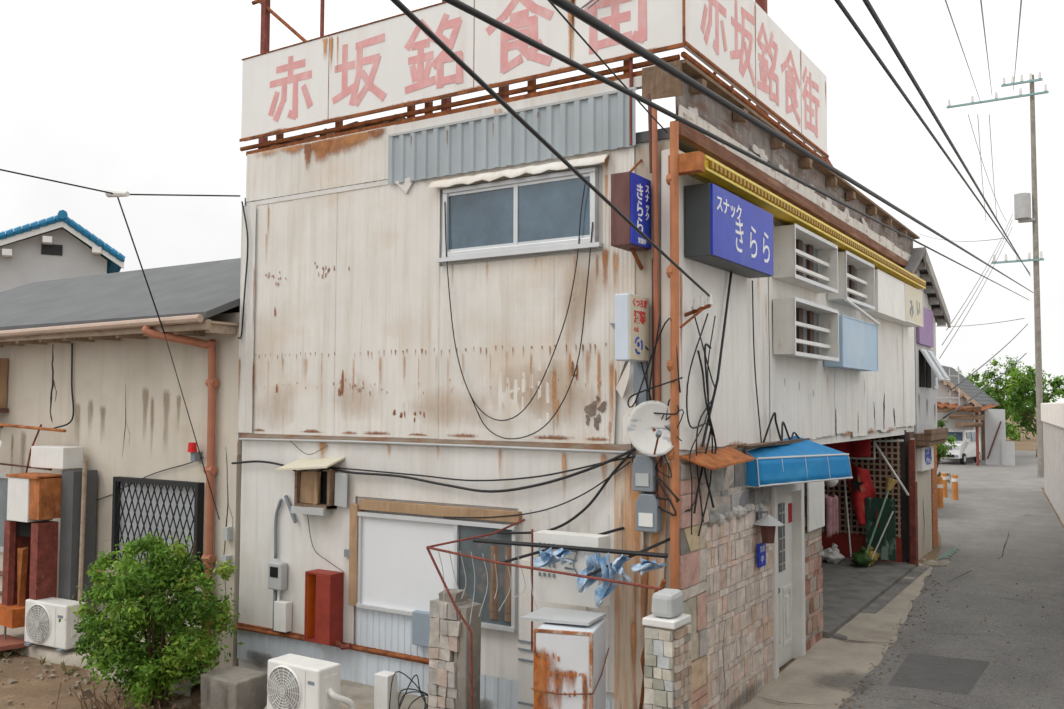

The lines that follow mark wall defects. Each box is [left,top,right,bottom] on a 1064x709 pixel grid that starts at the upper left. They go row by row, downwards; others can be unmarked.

rust [262,128,384,165]
rust [480,343,617,405]